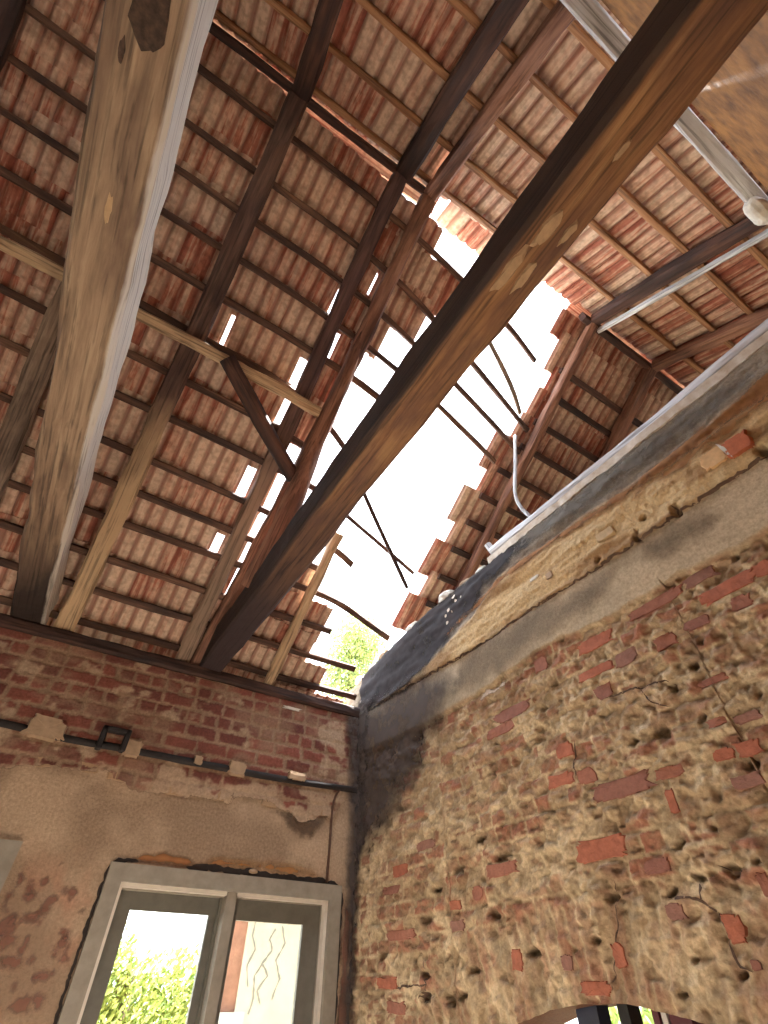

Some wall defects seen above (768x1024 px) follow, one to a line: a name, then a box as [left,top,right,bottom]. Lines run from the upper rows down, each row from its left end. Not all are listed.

crack [369,457,768,711]
flaking render [628,559,768,652]
flaking render [579,646,638,700]
spalling [0,627,351,822]
flaking render [487,698,531,740]
flaking render [548,763,685,814]
leakage [282,814,323,837]
flaking render [576,832,628,864]
peeling [0,873,77,1014]
flaking render [449,859,520,932]
crack [668,865,752,972]
flaking render [376,977,406,1015]